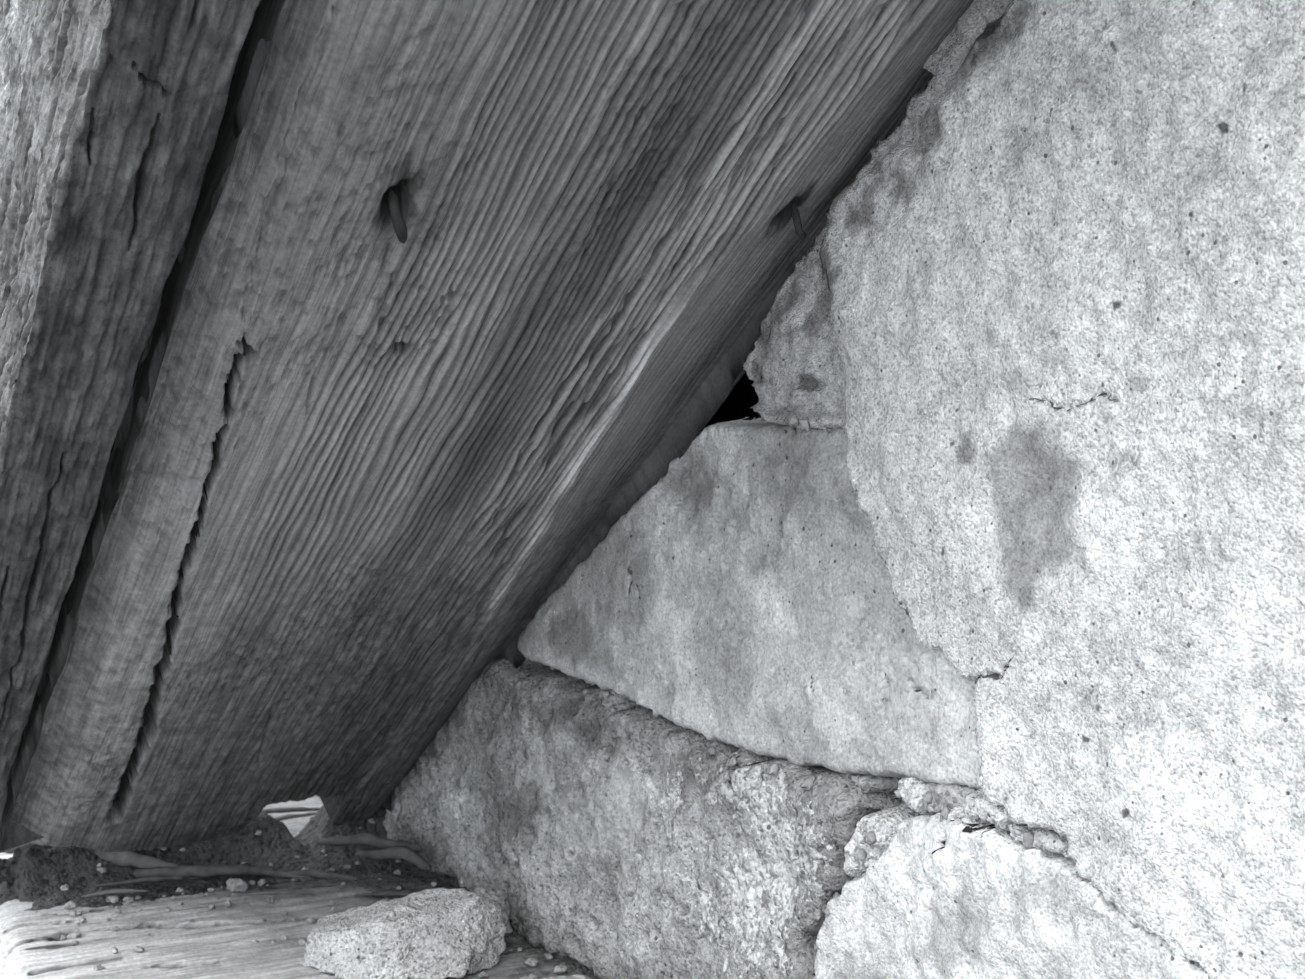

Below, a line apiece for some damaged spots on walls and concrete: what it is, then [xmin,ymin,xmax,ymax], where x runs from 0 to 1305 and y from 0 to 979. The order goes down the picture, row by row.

crack [931,820,1054,854]